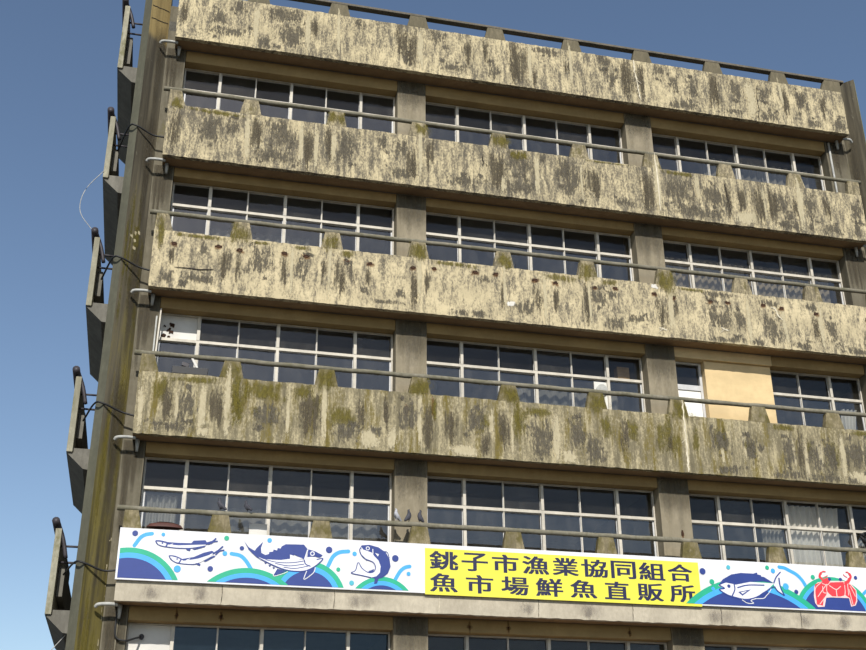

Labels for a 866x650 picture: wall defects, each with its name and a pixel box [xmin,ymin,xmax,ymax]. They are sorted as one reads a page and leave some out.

damp [506,43,537,86]
damp [618,60,645,102]
damp [298,121,337,171]
damp [640,159,662,211]
damp [724,184,779,225]
damp [411,256,431,309]
damp [96,385,144,518]
damp [196,366,232,436]
damp [285,383,327,440]
damp [356,397,397,449]
damp [445,410,514,456]
damp [552,414,579,464]